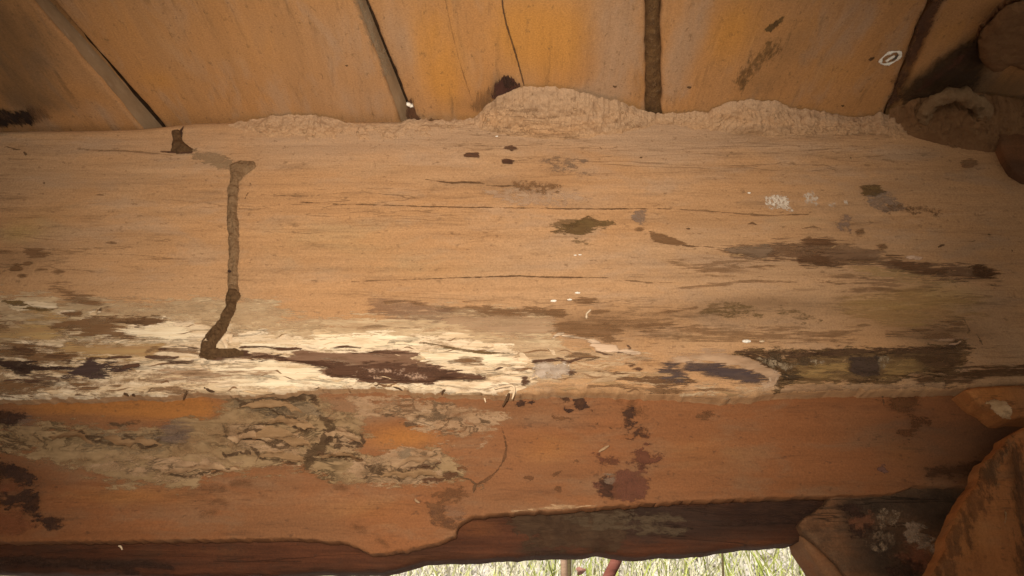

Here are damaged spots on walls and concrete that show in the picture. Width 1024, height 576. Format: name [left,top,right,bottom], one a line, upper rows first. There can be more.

leakage [550,216,616,239]
peeling [0,284,782,490]
leakage [0,458,64,531]